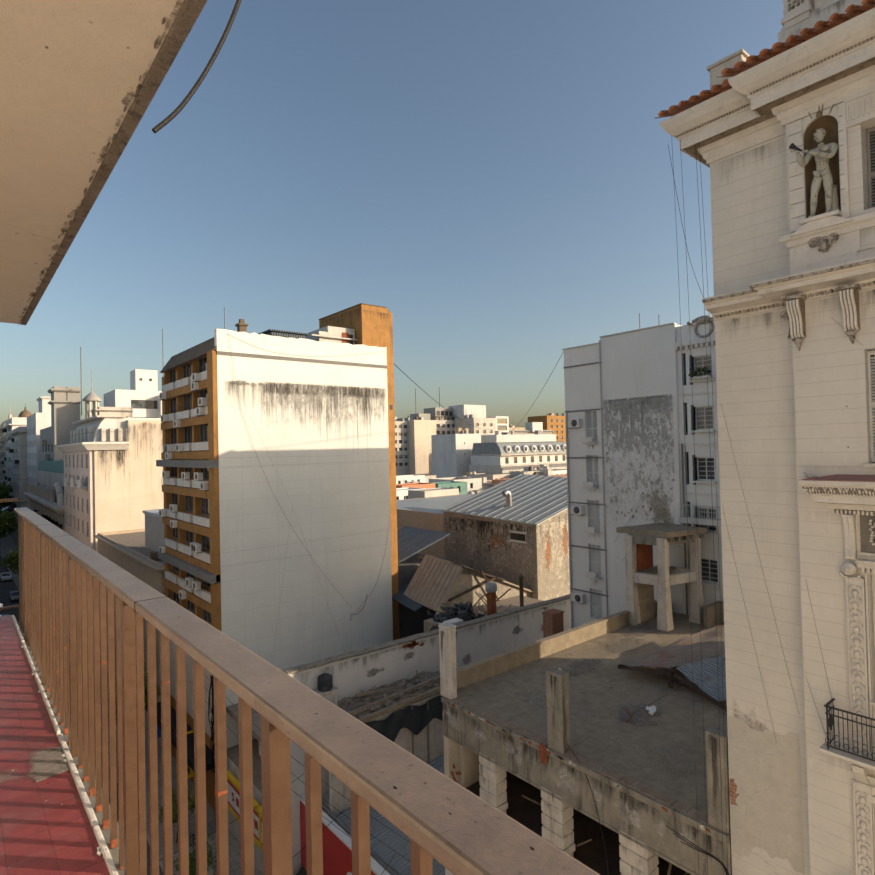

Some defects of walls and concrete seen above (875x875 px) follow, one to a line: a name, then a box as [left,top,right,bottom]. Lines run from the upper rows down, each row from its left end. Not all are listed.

leakage [604,394,674,505]
peeling [446,516,569,582]
spalling [730,778,739,805]